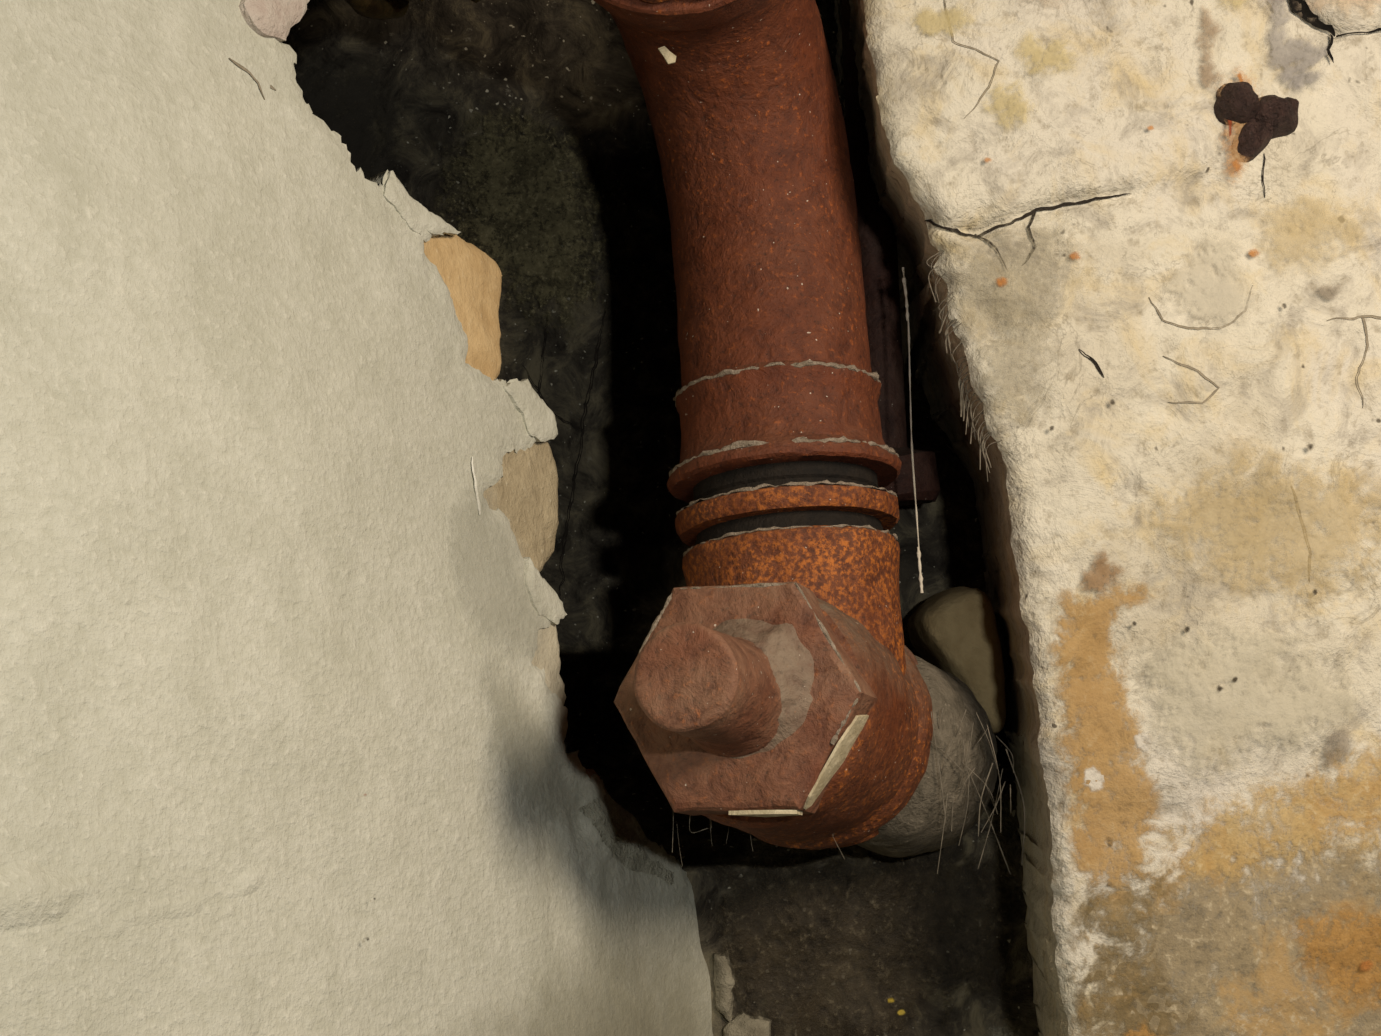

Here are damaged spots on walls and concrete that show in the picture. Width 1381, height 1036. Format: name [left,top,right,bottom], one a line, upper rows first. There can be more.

peeling [239,0,310,42]
crack [1289,0,1381,63]
rust [1225,120,1246,177]
crack [925,193,1130,271]
spalling [379,170,567,706]
damp [1052,552,1381,1036]